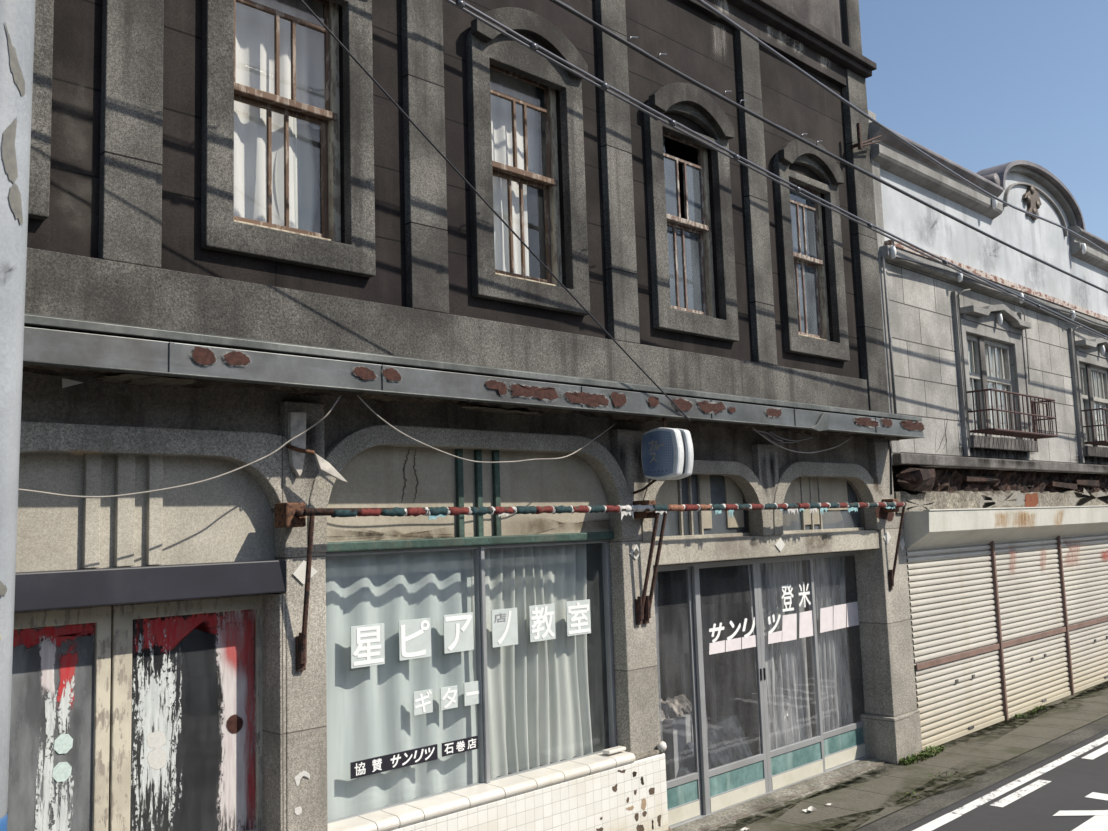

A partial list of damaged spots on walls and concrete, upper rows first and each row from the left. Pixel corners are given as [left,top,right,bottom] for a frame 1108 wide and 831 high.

peeling [2,117,23,225]
corrosion [192,346,250,366]
corrosion [353,366,401,381]
corrosion [486,380,626,407]
corrosion [673,398,736,414]
corrosion [854,417,925,431]
crack [401,449,419,502]
spalling [979,490,1038,508]
spalling [1068,488,1108,506]
peeling [13,623,95,831]
peeling [131,609,256,831]
spalling [612,770,661,831]